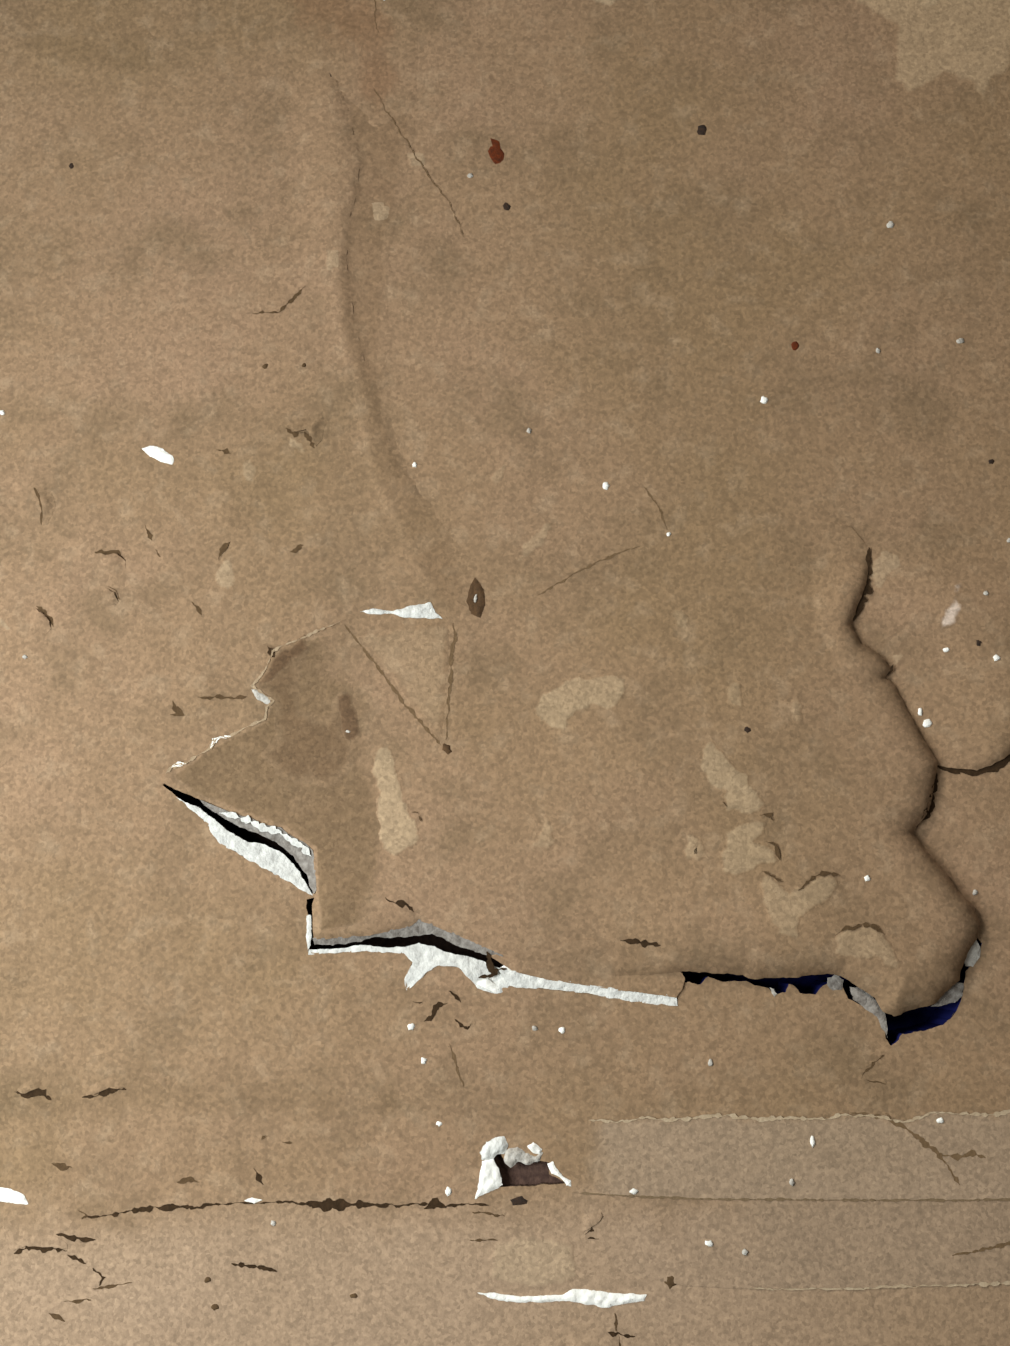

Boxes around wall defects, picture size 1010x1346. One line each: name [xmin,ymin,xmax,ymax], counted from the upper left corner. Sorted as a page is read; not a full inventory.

peeling [855,0,1010,102]
peeling [872,550,902,589]
peeling [534,673,626,730]
peeling [371,746,422,857]
peeling [683,740,840,940]
peeling [835,922,903,970]
peeling [477,978,500,992]
spalling [527,1142,571,1186]
peeling [477,1289,647,1308]